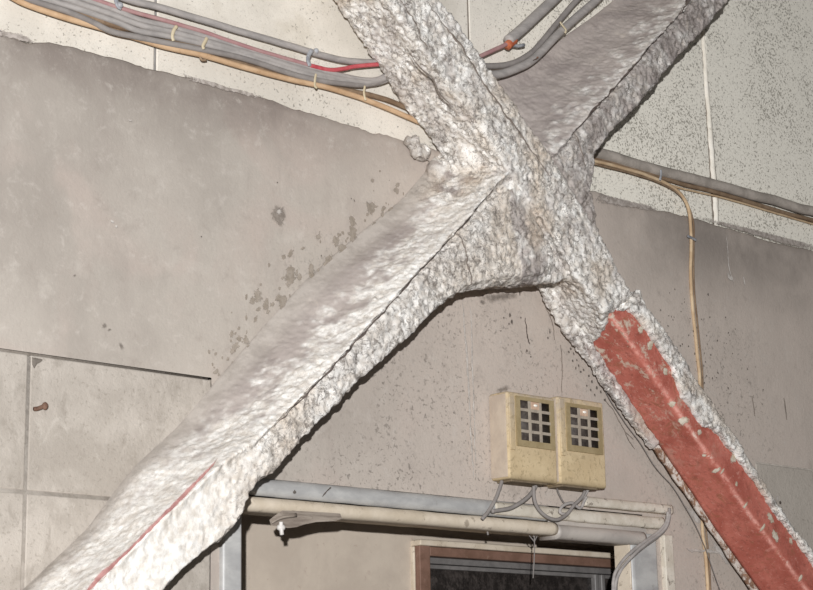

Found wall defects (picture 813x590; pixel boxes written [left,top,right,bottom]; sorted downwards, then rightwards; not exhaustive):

crack [275,184,497,425]
peeling [760,513,785,542]